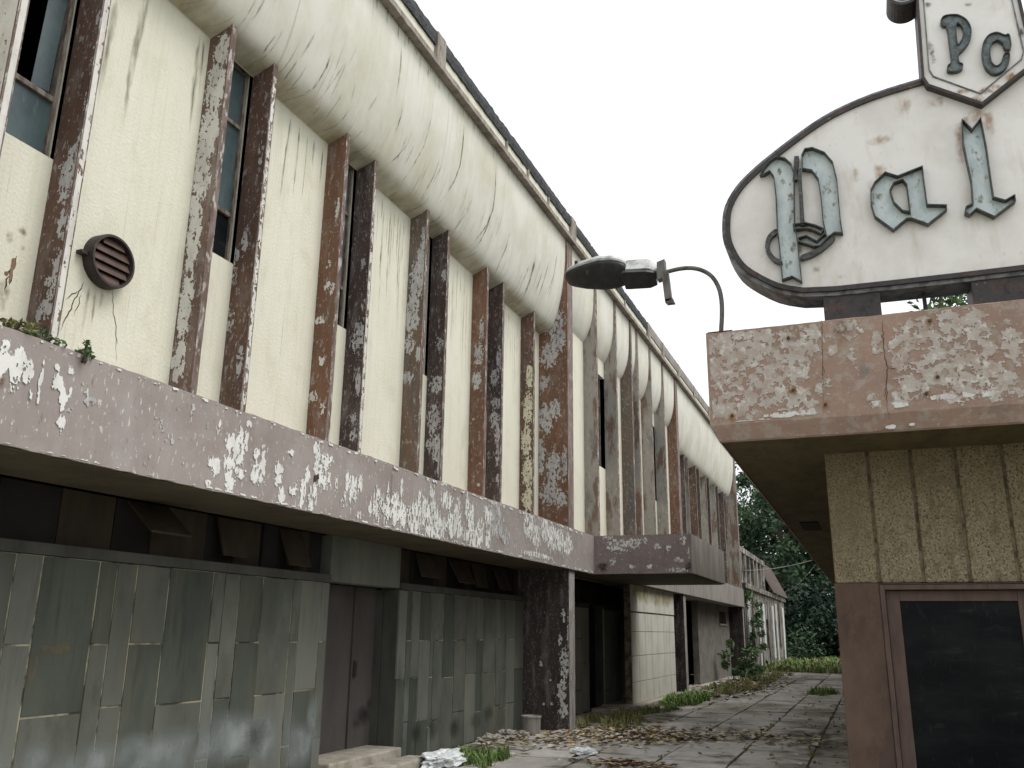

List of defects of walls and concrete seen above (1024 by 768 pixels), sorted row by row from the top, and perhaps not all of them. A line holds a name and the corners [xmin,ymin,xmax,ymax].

peeling [35,0,110,348]
peeling [138,34,230,416]
peeling [0,339,99,434]
crack [61,284,83,329]
peeling [193,77,593,573]
peeling [709,307,1024,423]
crack [882,323,895,416]
peeling [603,535,689,572]
peeling [543,608,569,718]